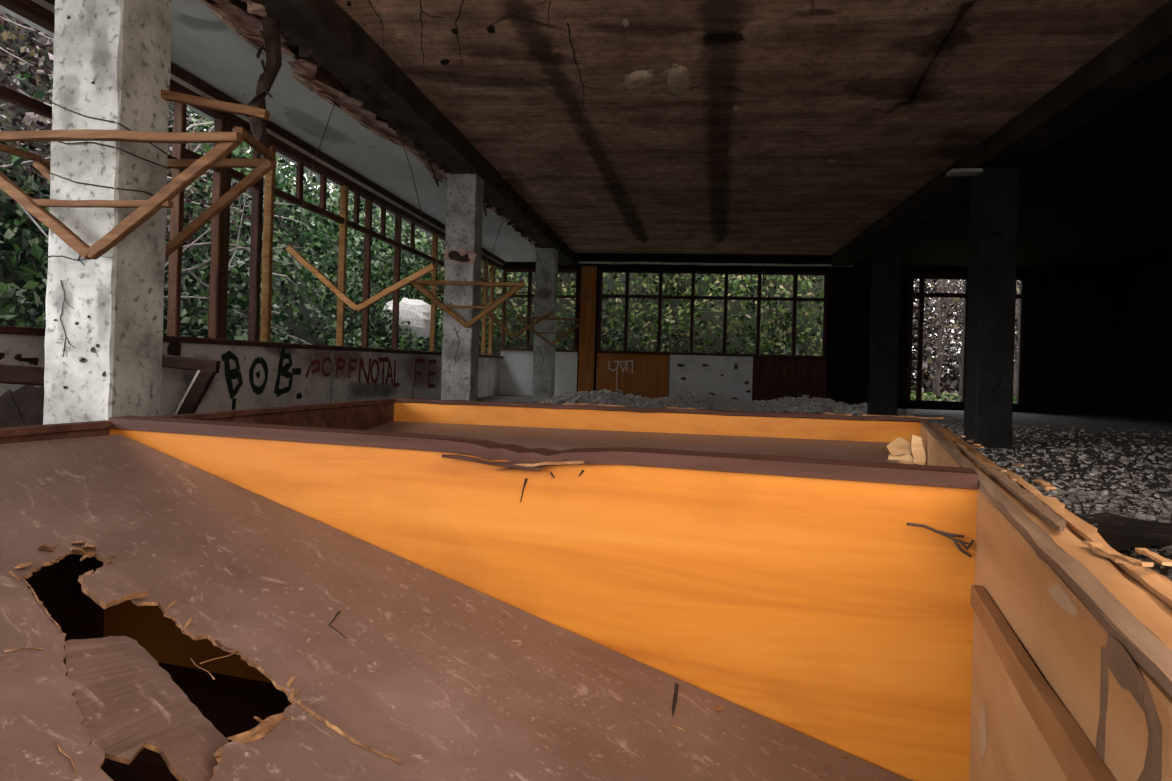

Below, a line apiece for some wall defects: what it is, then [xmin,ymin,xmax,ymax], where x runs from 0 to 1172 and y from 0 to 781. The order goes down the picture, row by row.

peeling [198,0,451,183]
crack [520,469,584,502]